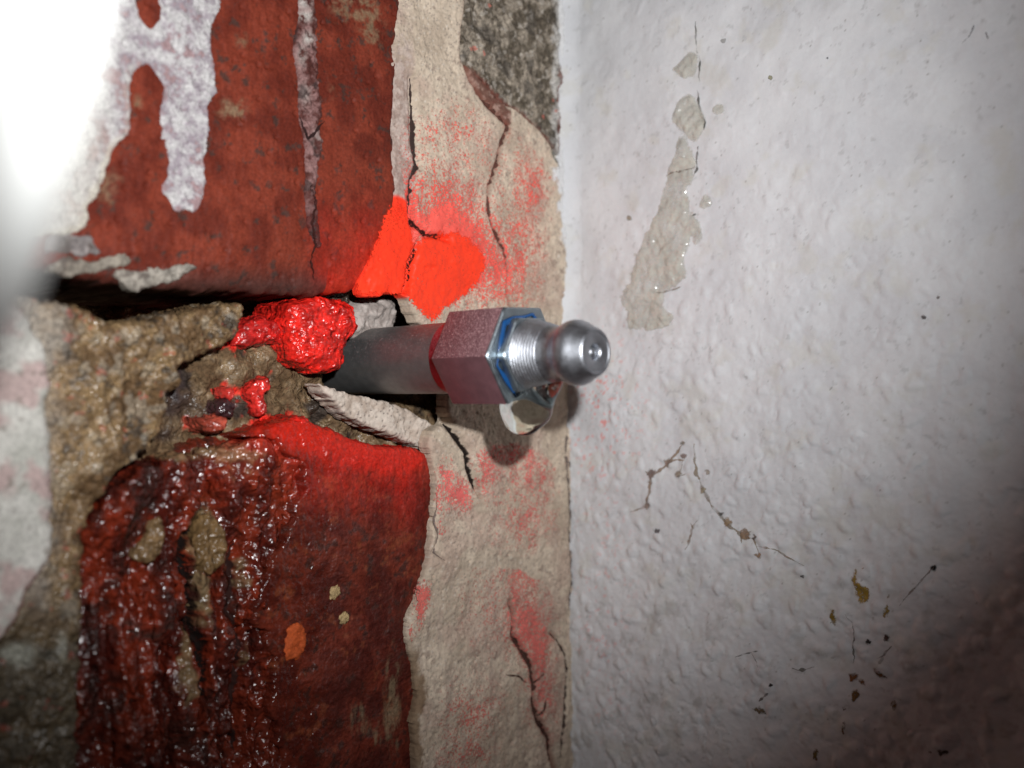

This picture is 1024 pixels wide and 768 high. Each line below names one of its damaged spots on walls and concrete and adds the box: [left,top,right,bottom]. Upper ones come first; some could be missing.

peeling [44,0,221,293]
crack [402,78,440,289]
crack [469,82,509,258]
crack [442,424,474,490]
crack [508,432,573,760]